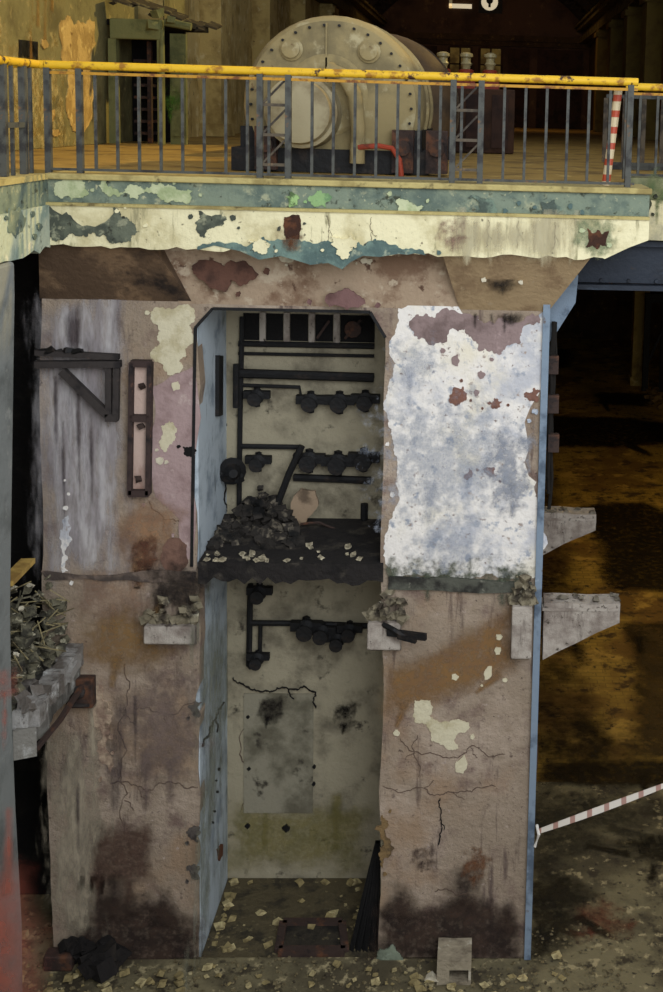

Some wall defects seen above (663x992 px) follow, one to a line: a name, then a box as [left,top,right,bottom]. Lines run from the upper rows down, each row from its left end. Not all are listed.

flaking render [40,15,96,137]
peeling [4,180,429,297]
peeling [145,304,201,559]
peeling [383,305,548,606]
water stain [45,689,201,959]
crack [202,677,317,763]
peeling [413,699,475,774]
crack [383,735,505,845]
water stain [375,871,519,959]